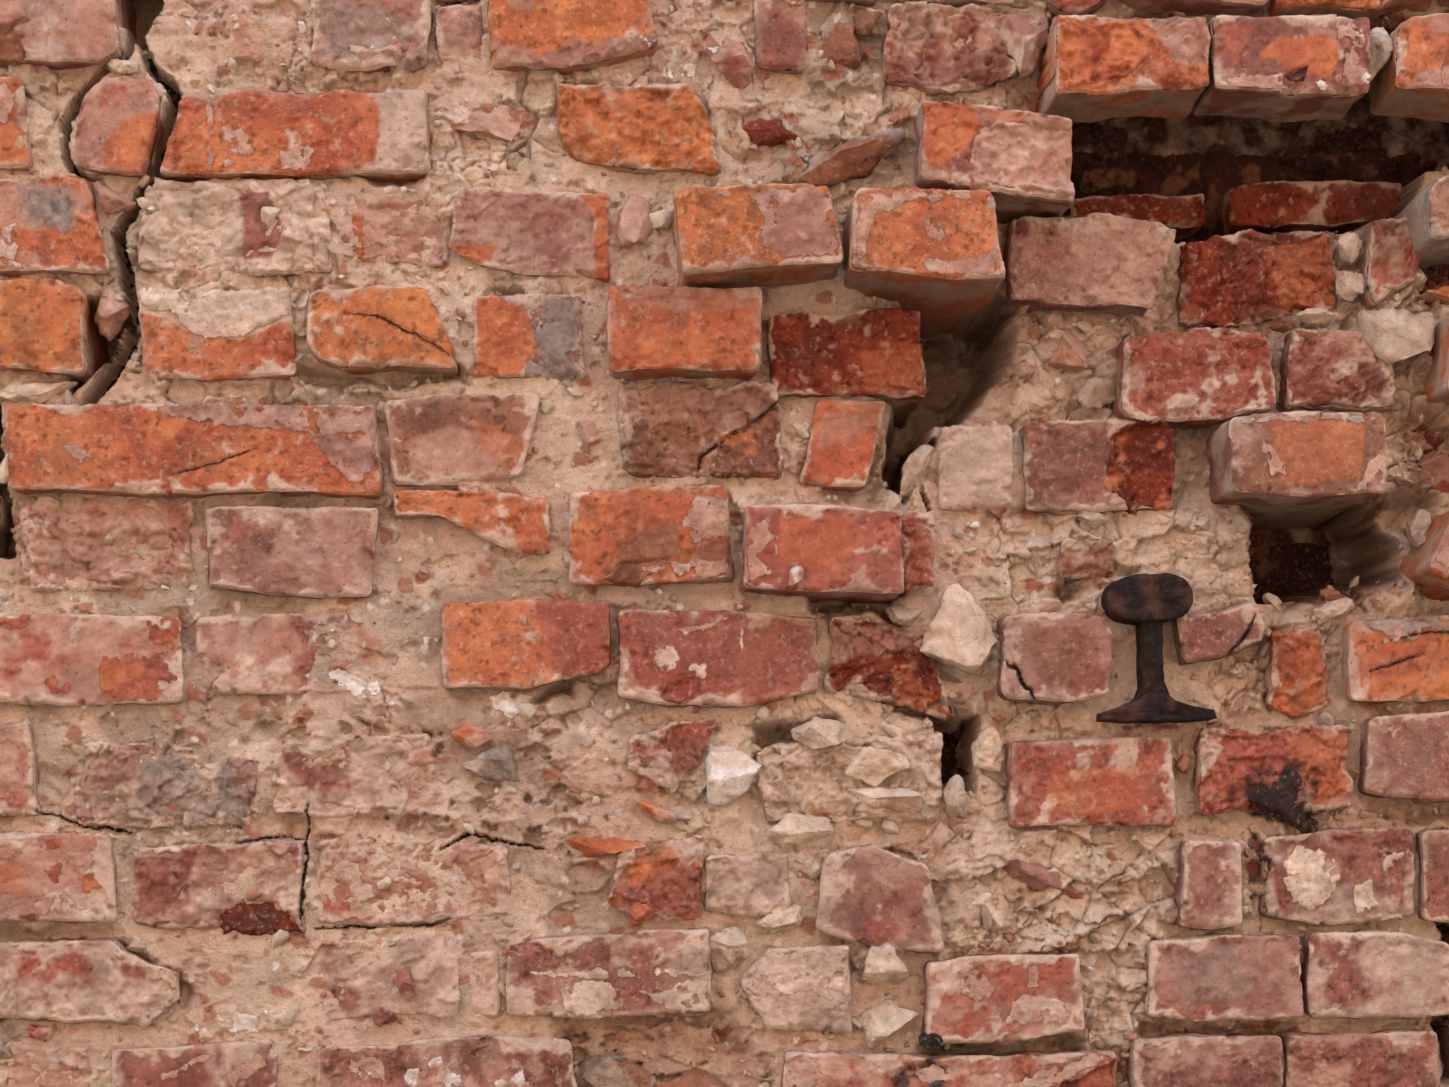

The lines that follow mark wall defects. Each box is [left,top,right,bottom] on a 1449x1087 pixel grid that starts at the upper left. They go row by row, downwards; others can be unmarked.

crack [68,131,82,178]
crack [146,50,182,162]
spalling [556,82,730,199]
crack [105,242,140,395]
spalling [748,120,1438,424]
crack [174,448,254,474]
peeling [1261,440,1286,476]
peeling [1356,453,1387,492]
hole [1248,543,1370,604]
corrosion [1228,761,1325,910]